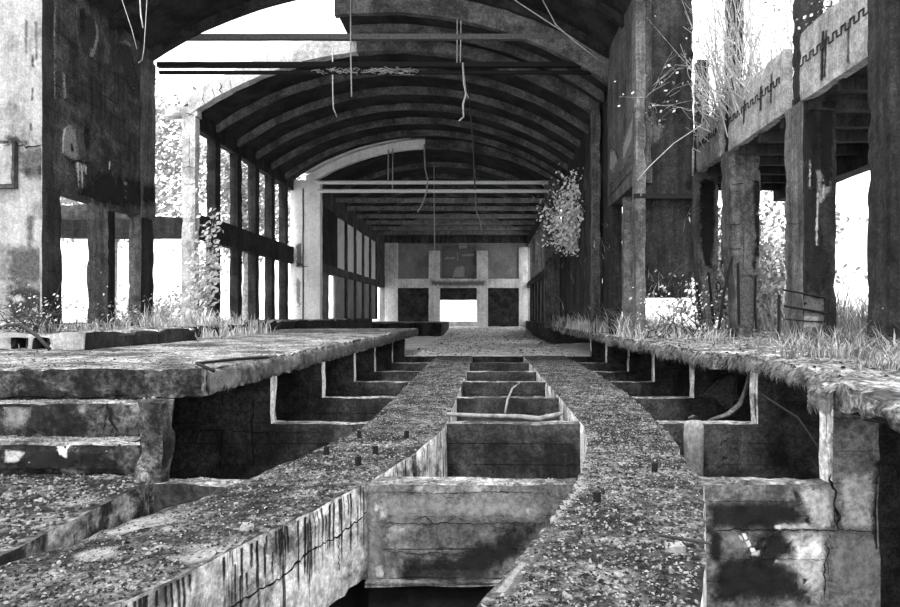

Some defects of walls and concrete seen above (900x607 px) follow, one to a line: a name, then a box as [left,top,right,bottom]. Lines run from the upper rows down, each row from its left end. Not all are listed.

water stain [75,126,154,208]
water stain [125,574,192,607]
water stain [222,487,364,607]
crack [230,491,552,607]
water stain [378,433,543,588]
crack [707,475,871,601]
water stain [707,461,881,605]